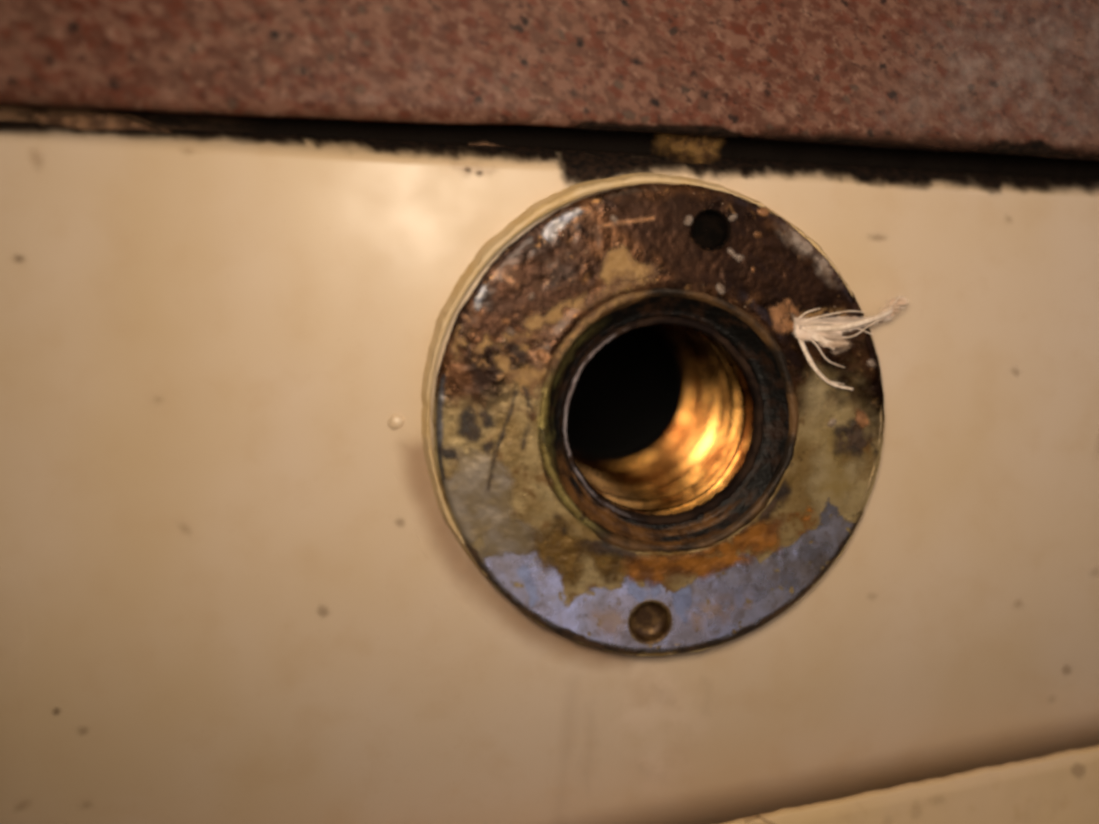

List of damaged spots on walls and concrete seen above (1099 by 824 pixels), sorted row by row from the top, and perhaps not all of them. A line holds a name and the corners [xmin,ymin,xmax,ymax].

rust [859,312,884,409]
rust [465,542,643,654]
rust [535,462,813,584]
rust [676,512,862,653]